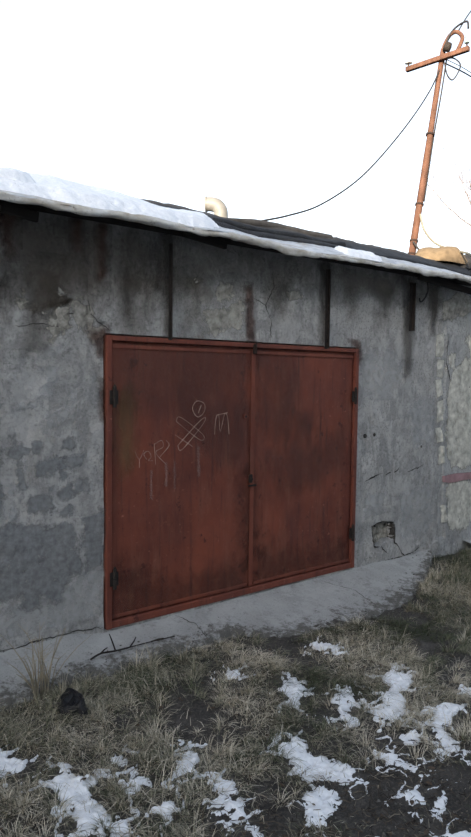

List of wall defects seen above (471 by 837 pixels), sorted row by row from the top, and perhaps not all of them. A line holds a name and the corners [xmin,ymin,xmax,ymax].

crack [18,301,110,331]
peeling [435,333,471,471]
flaking render [372,522,389,543]
peeling [440,480,471,533]